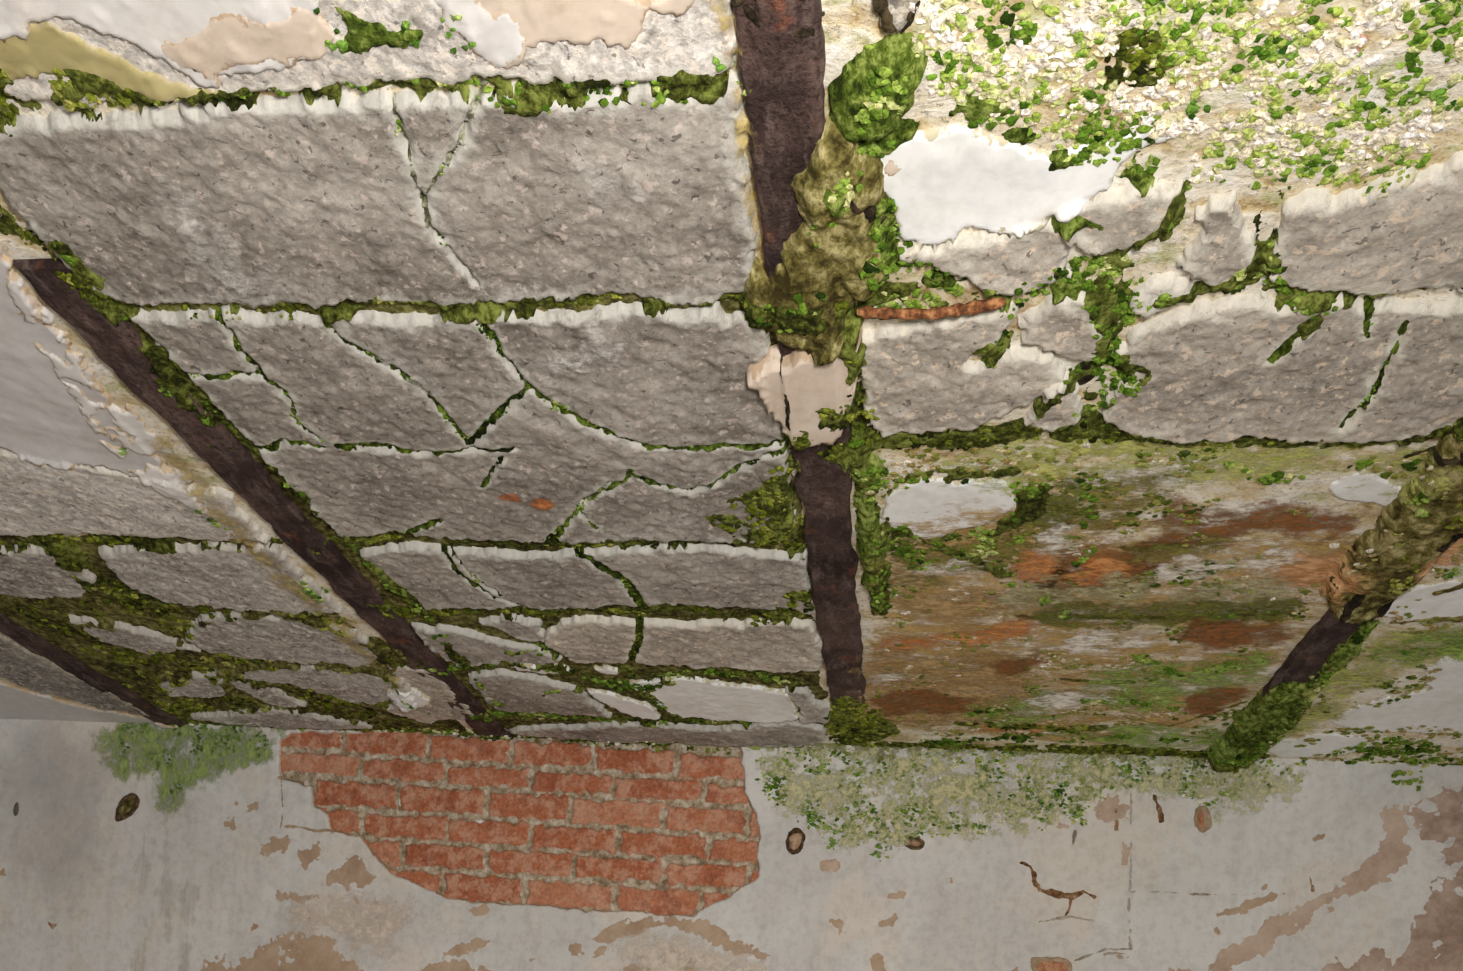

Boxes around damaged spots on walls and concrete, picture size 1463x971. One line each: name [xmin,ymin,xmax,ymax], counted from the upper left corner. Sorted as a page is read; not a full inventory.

peeling [0,0,334,102]
peeling [435,0,695,70]
crack [392,75,489,253]
crack [1266,331,1300,364]
crack [1338,295,1410,428]
crack [150,284,799,662]
rust [1011,496,1357,604]
rust [875,618,1034,651]
rust [1180,618,1291,651]
rust [873,690,971,716]
flaking render [201,731,771,971]
peeling [1168,786,1463,971]